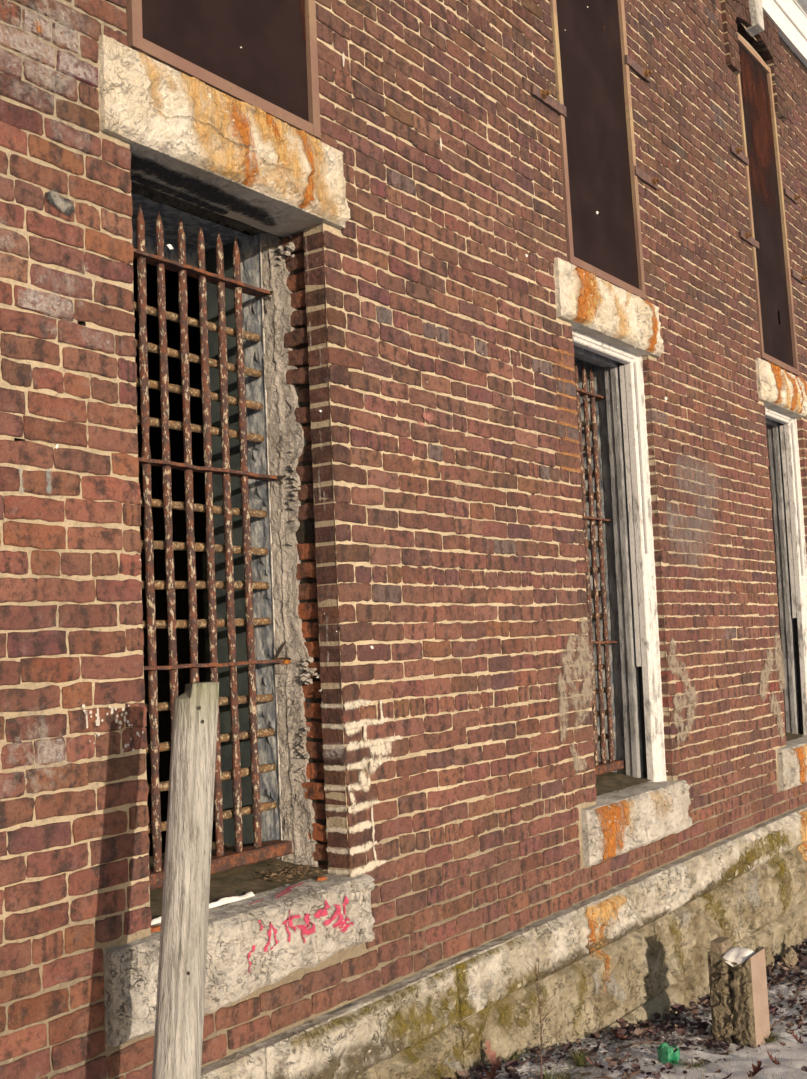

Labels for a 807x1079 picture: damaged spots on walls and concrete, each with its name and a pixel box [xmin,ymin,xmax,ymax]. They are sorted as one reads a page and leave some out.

corrosion [179,71,326,208]
corrosion [573,264,629,339]
corrosion [645,301,658,353]
corrosion [767,361,807,417]
corrosion [597,800,630,861]
water stain [685,857,753,936]
water stain [769,836,790,906]
corrosion [586,895,626,982]
water stain [293,986,414,1044]
water stain [429,911,684,1079]
crack [714,972,738,1031]
water stain [306,1040,405,1079]